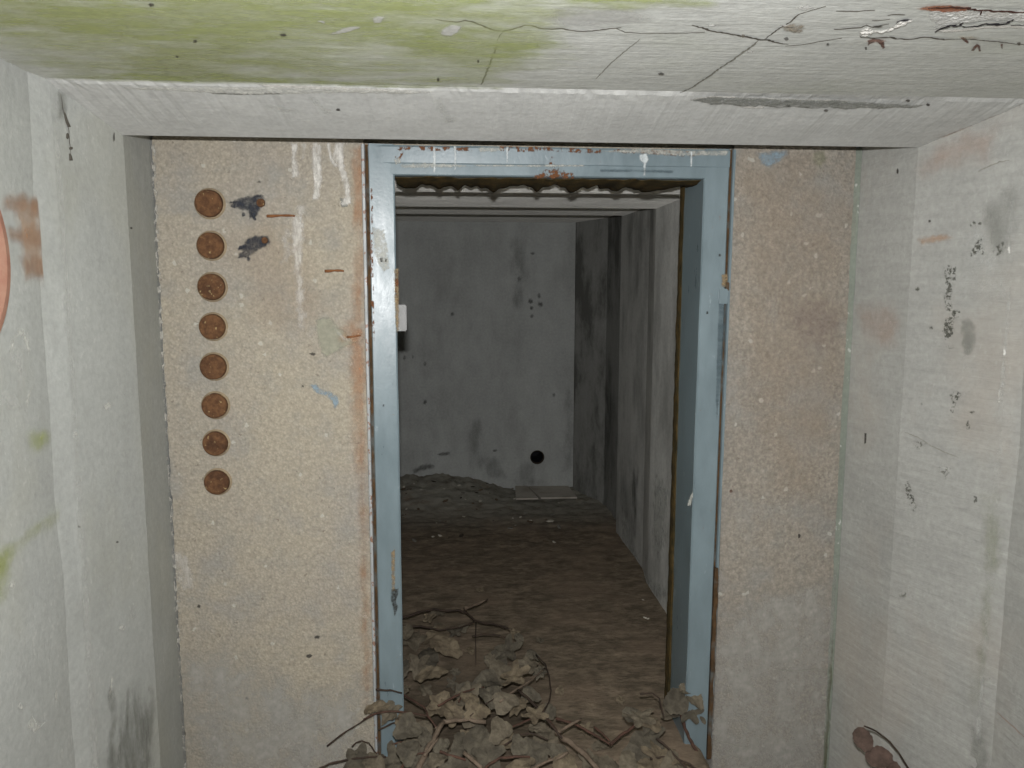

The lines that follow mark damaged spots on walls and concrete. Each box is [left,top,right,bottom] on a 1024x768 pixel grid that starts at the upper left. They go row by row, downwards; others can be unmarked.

crack [436,19,634,41]
crack [690,6,1024,46]
spalling [860,19,912,50]
corrosion [395,146,468,159]
corrosion [500,146,601,179]